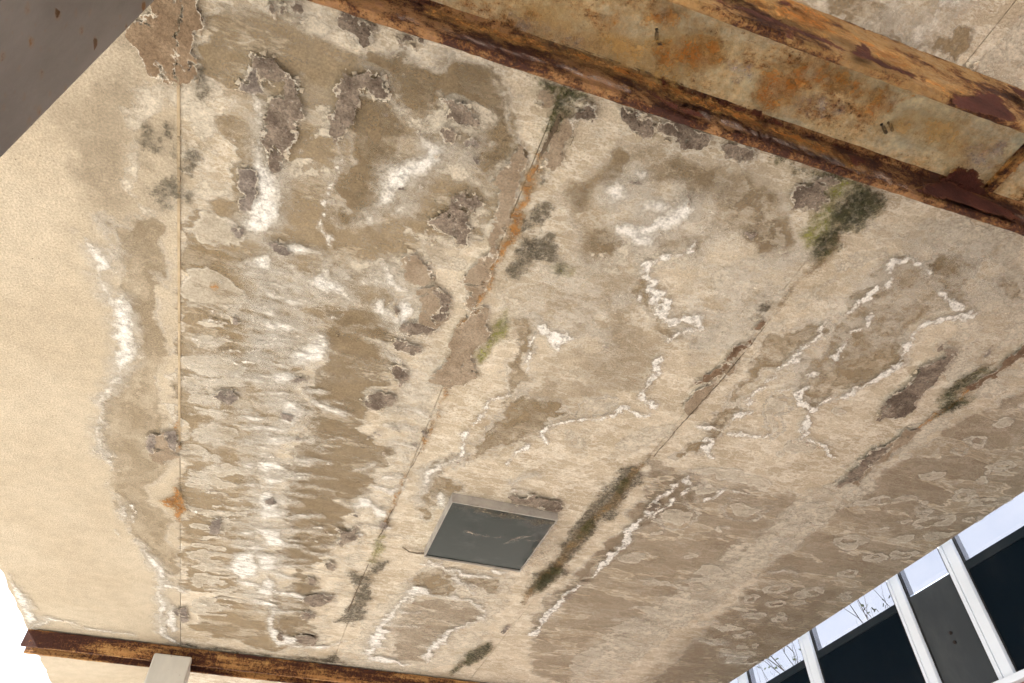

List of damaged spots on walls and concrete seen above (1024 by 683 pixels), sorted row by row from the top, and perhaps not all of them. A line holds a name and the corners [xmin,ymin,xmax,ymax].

peeling [124,0,204,89]
spalling [234,49,306,212]
corrosion [425,0,915,167]
spalling [617,104,757,165]
peeling [359,81,599,412]
water stain [506,202,573,283]
water stain [121,5,529,674]
crack [654,302,788,456]
water stain [526,146,1024,683]
corrosion [159,487,186,522]
crack [347,565,368,612]
crack [379,509,424,555]